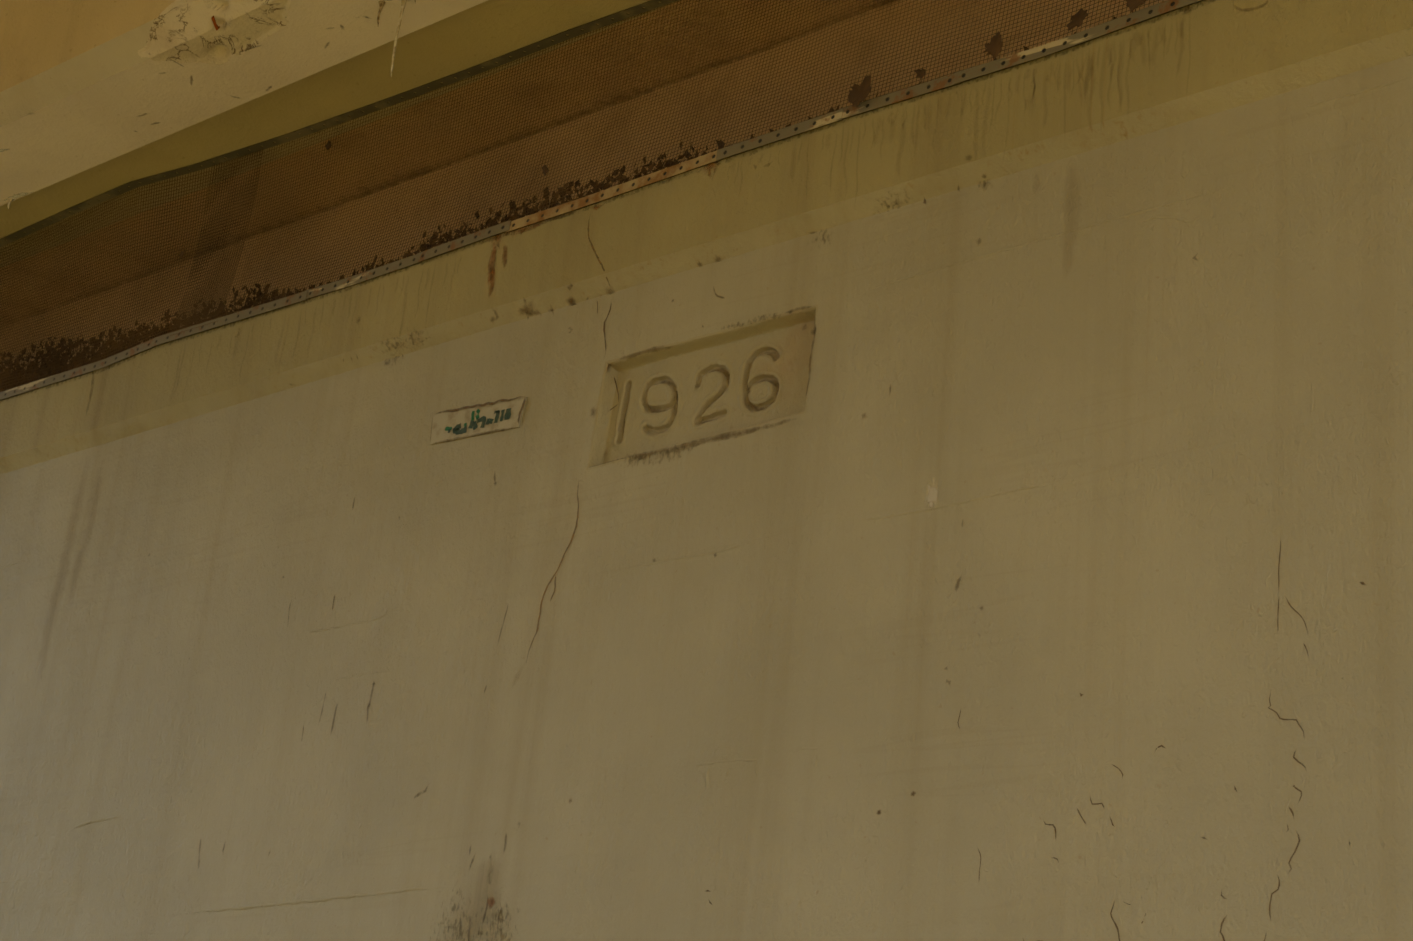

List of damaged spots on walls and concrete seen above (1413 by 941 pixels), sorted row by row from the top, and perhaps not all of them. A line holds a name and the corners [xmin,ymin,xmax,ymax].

spalling [137,0,292,81]
rust [488,217,558,294]
crack [530,493,579,647]